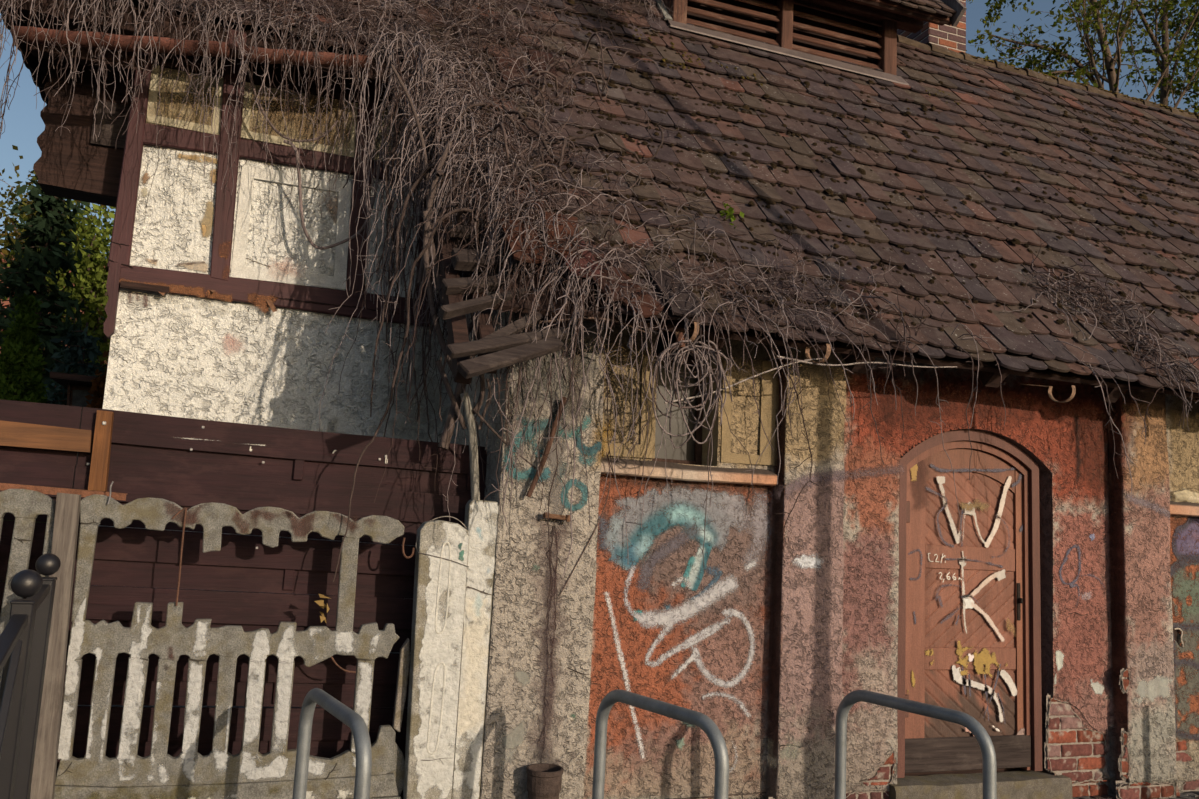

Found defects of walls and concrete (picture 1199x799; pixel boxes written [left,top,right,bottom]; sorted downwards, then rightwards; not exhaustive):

peeling [201,201,214,237]
peeling [119,241,232,302]
peeling [248,293,278,312]
peeling [58,598,169,784]
peeling [181,621,209,782]
peeling [214,626,298,791]
peeling [308,759,325,775]
peeling [309,628,380,727]
peeling [413,501,499,799]
flaking render [846,750,896,799]
flaking render [1044,651,1199,799]